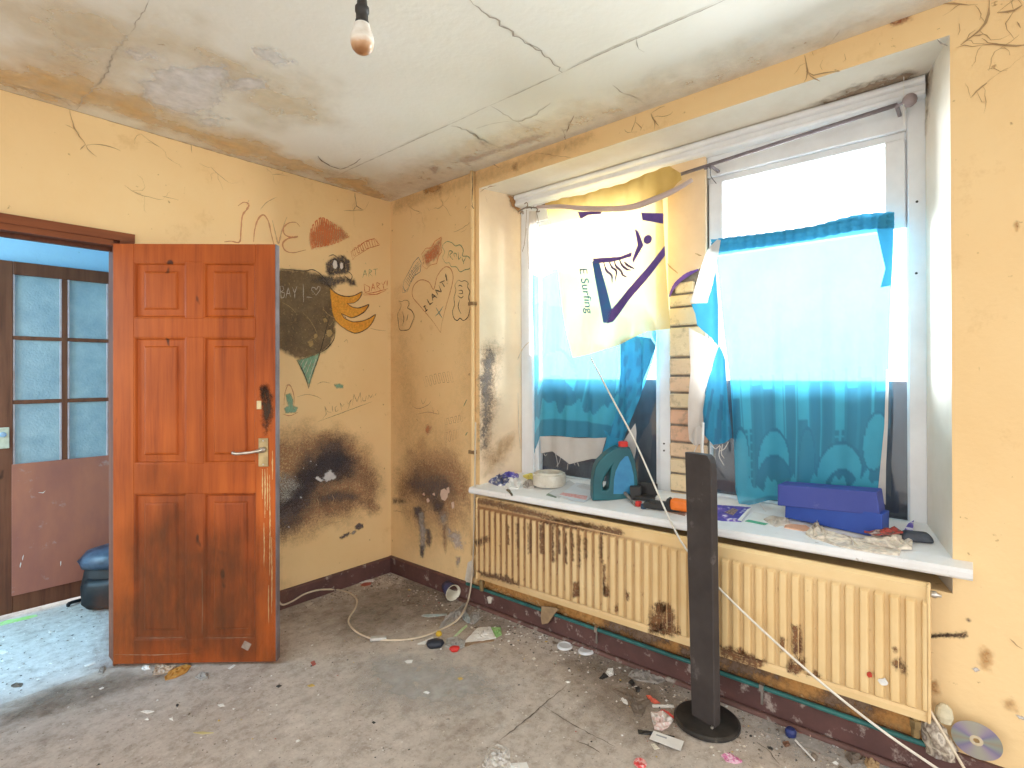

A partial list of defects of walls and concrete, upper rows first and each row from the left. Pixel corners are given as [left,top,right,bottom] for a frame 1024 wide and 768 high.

water stain [0,68,160,123]
peeling [144,67,264,124]
crack [0,0,724,232]
crack [937,0,1024,108]
water stain [479,349,494,446]
rust [475,499,622,597]
rust [478,572,690,658]
rust [720,624,922,739]